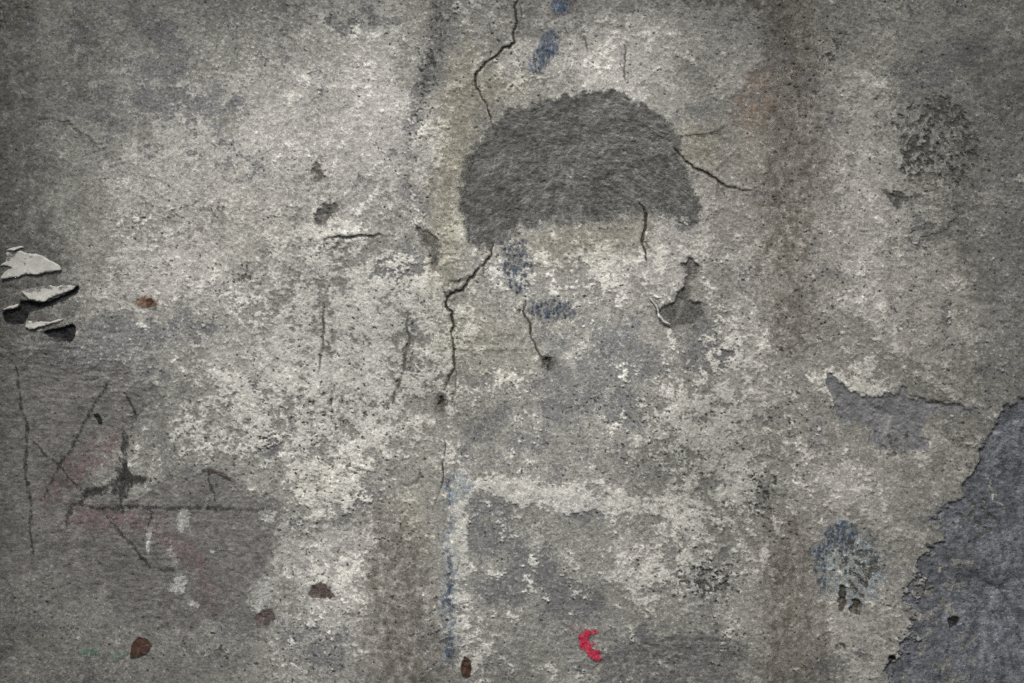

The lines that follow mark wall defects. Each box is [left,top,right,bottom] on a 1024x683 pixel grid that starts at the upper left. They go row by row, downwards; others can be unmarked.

crack [472,0,532,130]
crack [673,123,751,193]
crack [639,203,650,261]
peeling [0,246,79,342]
corrosion [137,296,157,308]
crack [442,244,545,403]
spalling [825,373,1024,683]